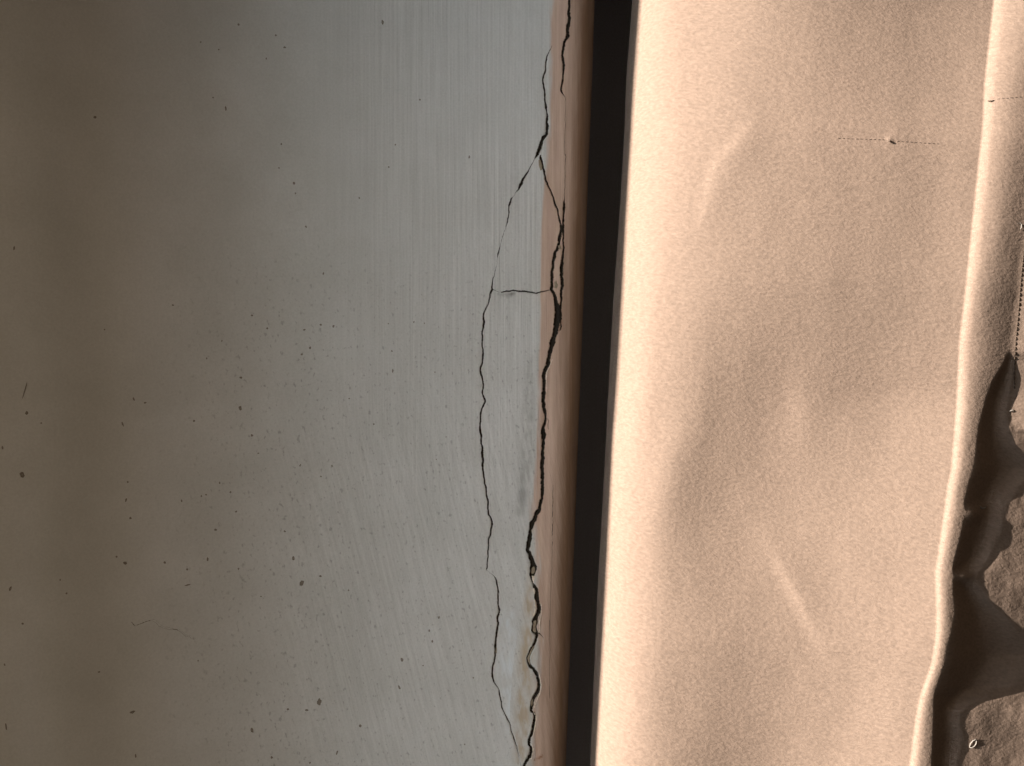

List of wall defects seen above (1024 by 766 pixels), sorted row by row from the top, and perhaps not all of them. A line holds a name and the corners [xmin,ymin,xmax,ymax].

crack [479,0,571,766]